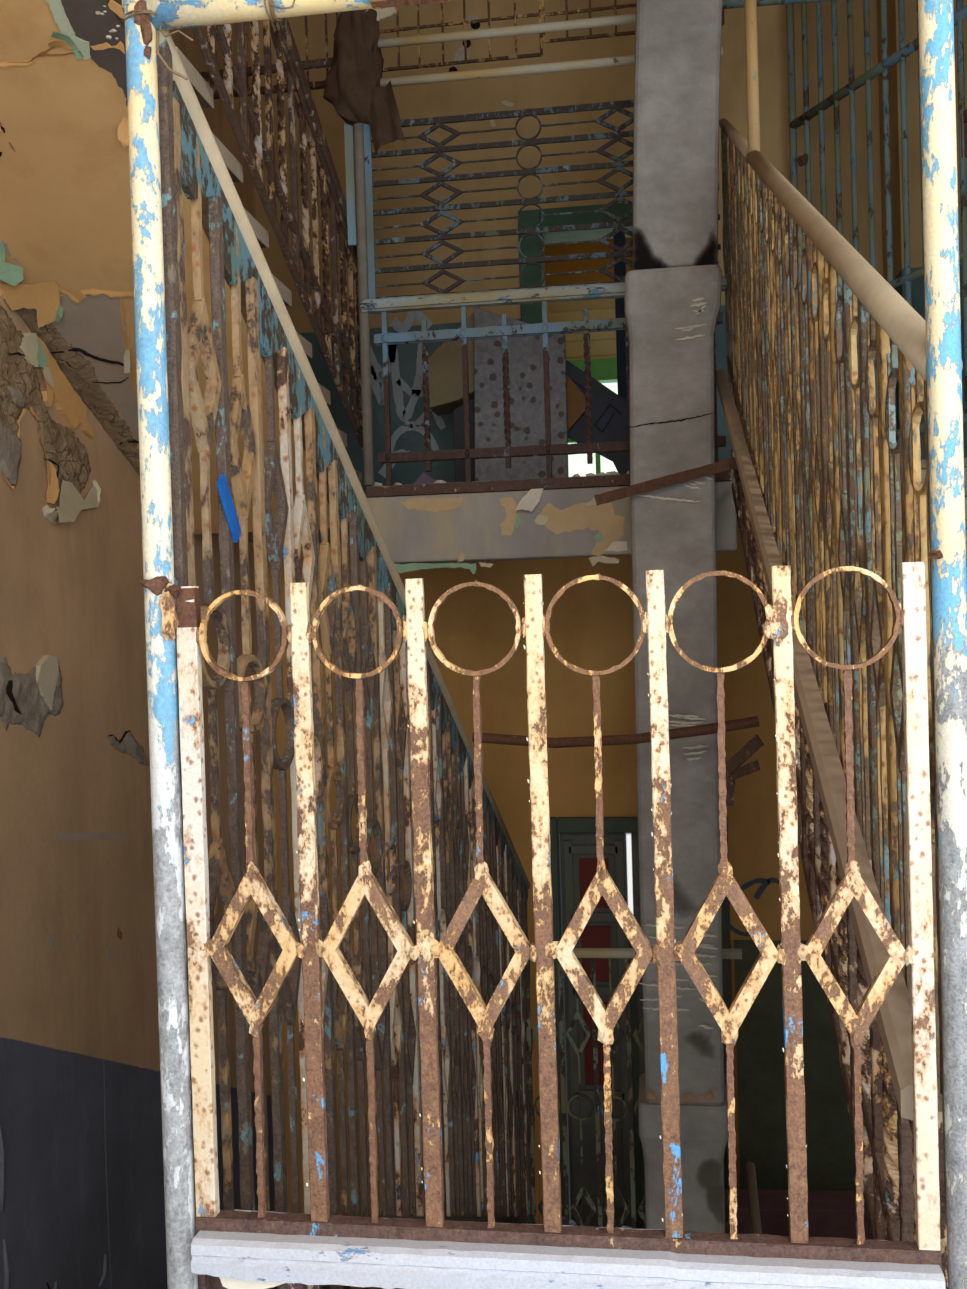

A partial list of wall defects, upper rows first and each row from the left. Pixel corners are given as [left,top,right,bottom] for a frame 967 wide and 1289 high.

flaking render [0,241,140,525]
peeling [401,497,464,512]
peeling [395,551,493,574]
peeling [499,488,628,566]
spalling [0,655,63,737]